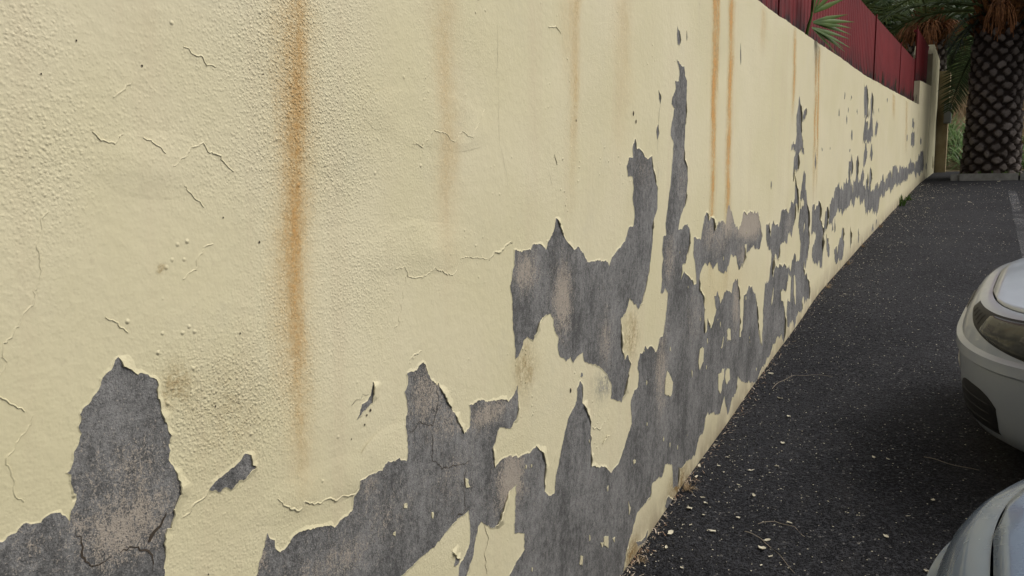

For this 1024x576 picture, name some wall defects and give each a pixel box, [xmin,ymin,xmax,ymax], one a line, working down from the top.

crack [184,46,217,67]
rust [711,0,733,212]
crack [93,131,235,208]
crack [394,241,513,329]
peeling [255,60,934,576]
peeling [0,354,192,576]
peeling [208,451,259,494]
crack [278,493,356,512]